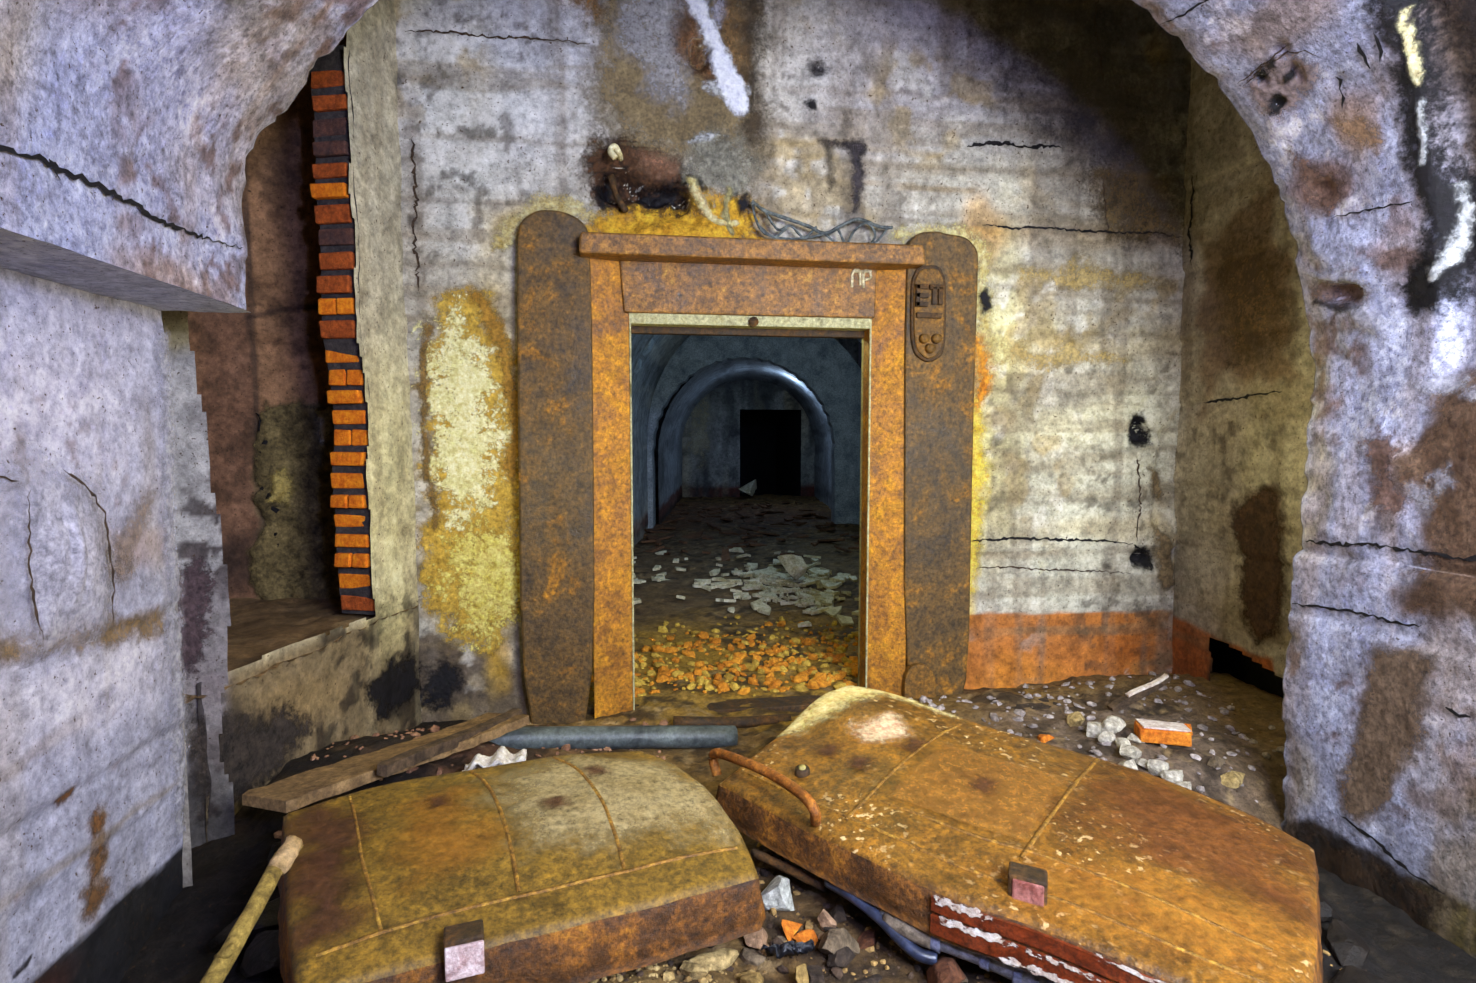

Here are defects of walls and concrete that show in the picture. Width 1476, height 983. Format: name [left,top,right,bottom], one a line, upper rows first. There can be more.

crack [1160,0,1208,25]
crack [0,145,243,249]
crack [1333,201,1412,218]
damp [1357,0,1476,317]
damp [1227,487,1290,645]
crack [1292,603,1422,627]
crack [1306,539,1476,562]
rust [80,809,110,917]